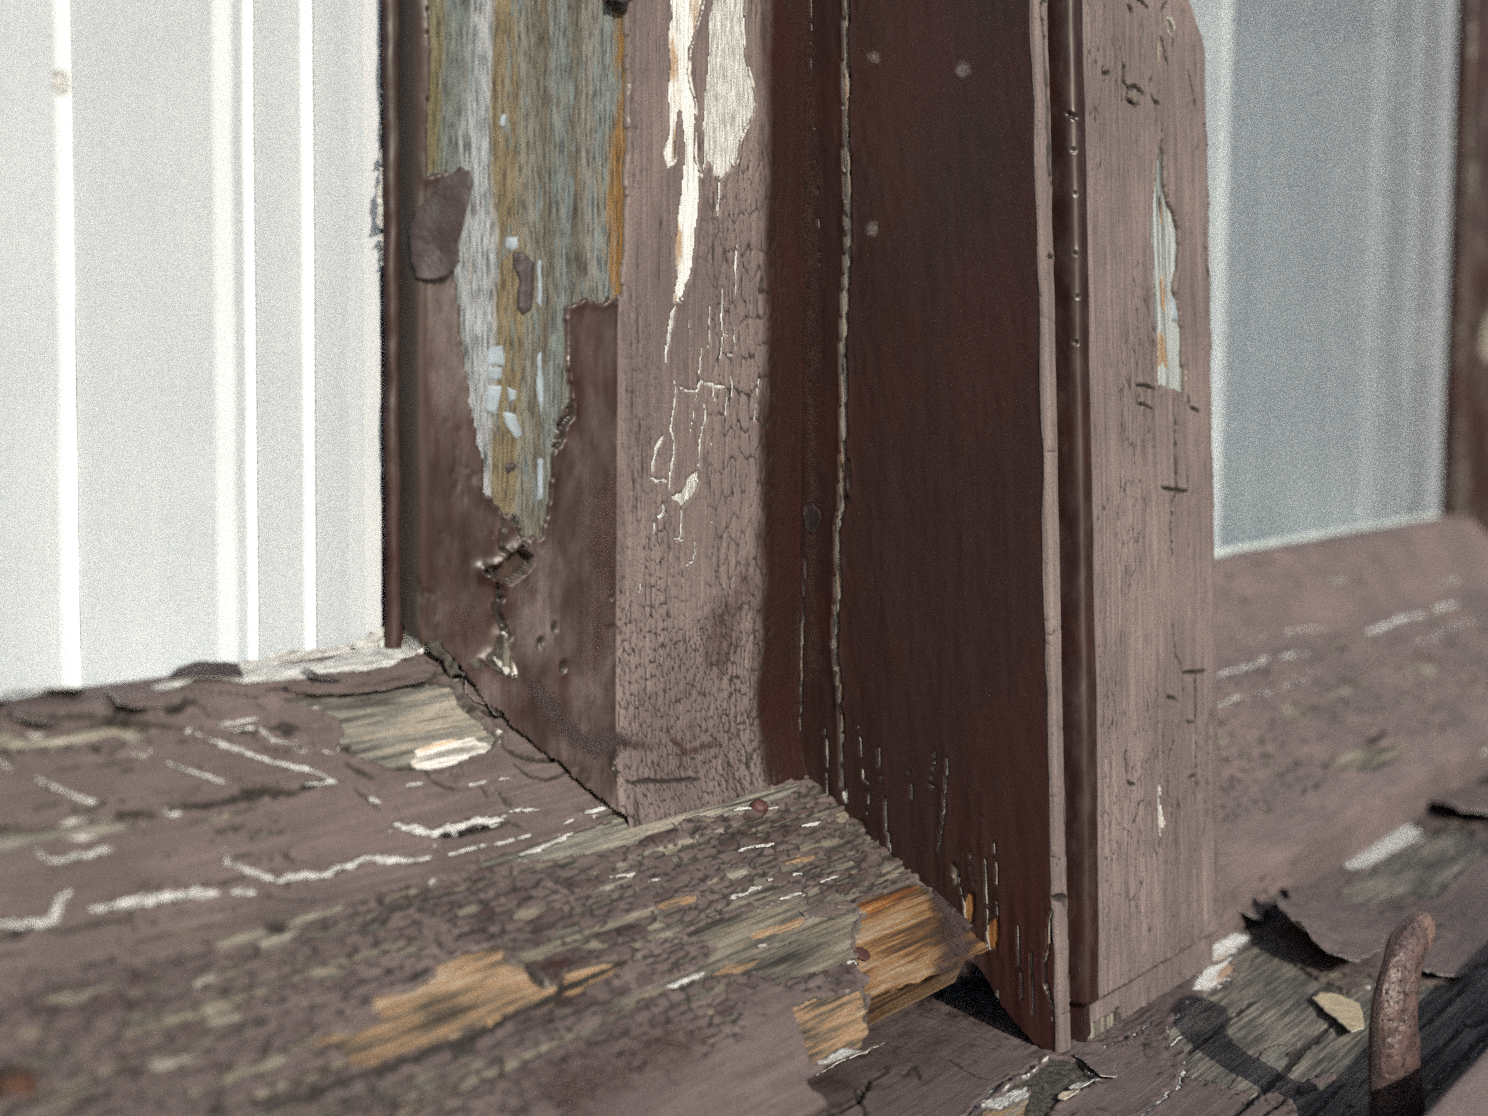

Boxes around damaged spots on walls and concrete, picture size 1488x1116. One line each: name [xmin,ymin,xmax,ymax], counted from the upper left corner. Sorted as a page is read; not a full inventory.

peeling [664,0,755,301]
peeling [409,0,632,581]
crack [651,182,760,567]
peeling [1150,149,1181,392]
crack [266,926,285,935]
crack [0,706,574,932]
peeling [285,668,505,770]
peeling [312,948,622,1067]
crack [609,872,661,881]
crack [609,759,696,783]
crack [666,944,767,988]
peeling [1168,782,1488,1116]